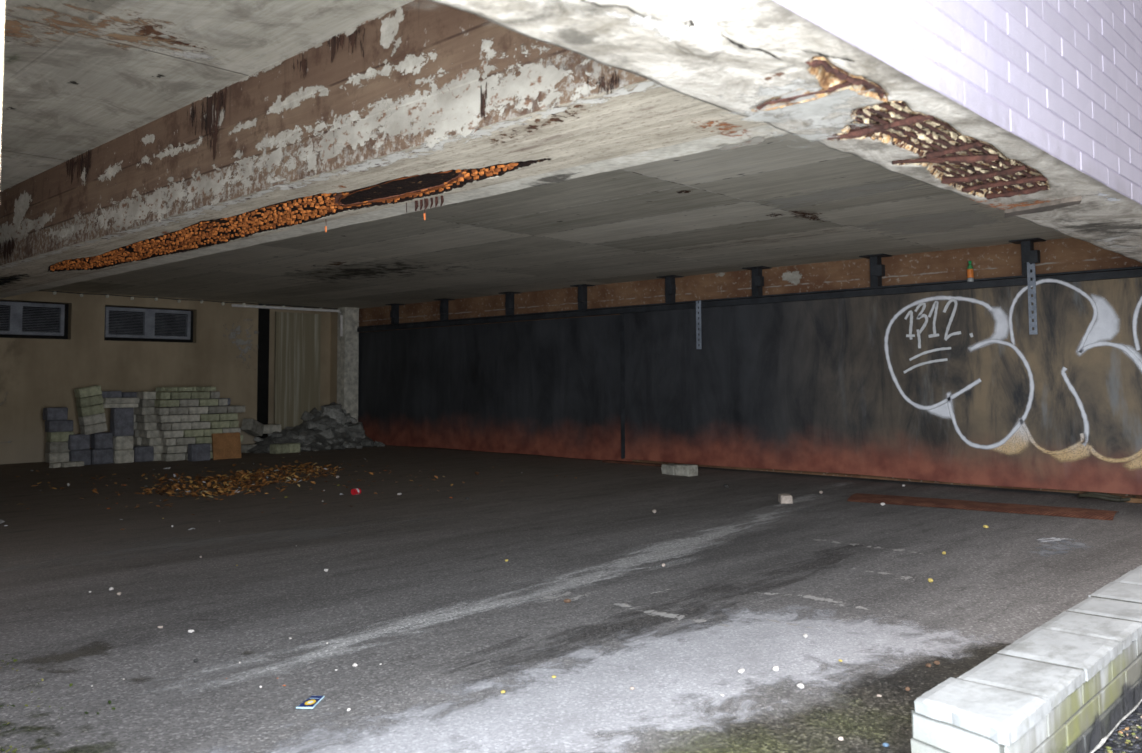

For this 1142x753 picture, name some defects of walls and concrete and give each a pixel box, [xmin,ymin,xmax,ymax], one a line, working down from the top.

damp [327,25,365,63]
crack [582,0,854,62]
damp [66,150,91,184]
damp [187,87,227,160]
peeling [0,6,663,272]
spalling [717,56,1082,218]